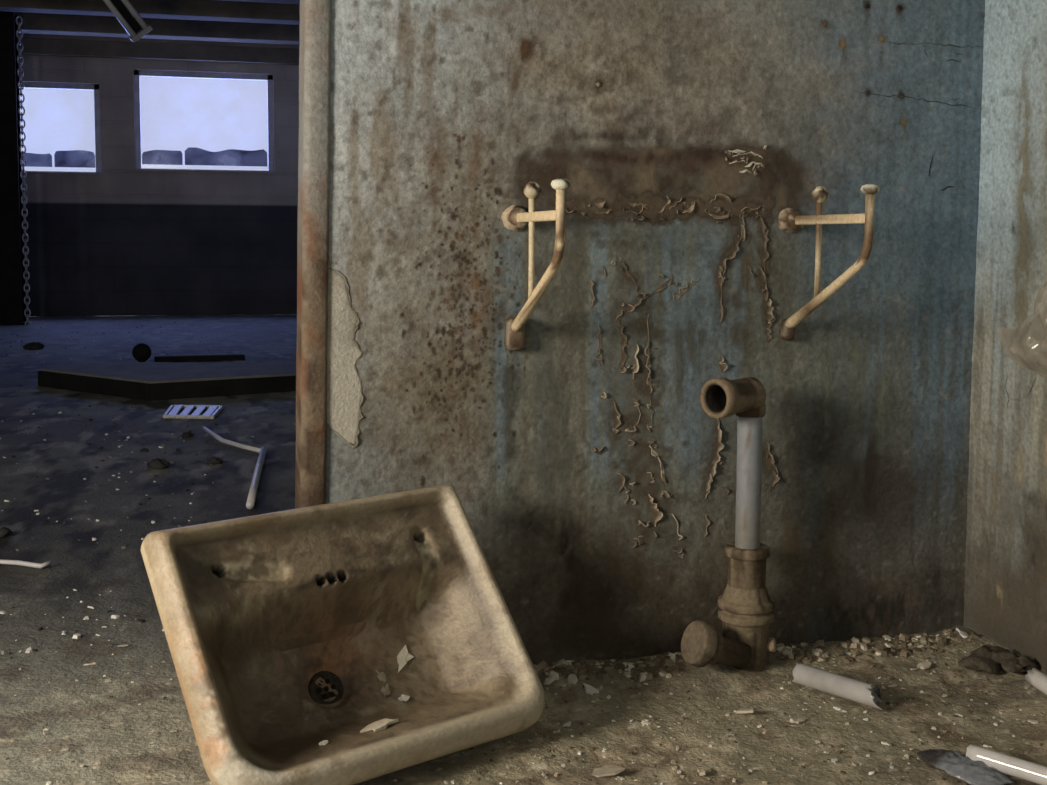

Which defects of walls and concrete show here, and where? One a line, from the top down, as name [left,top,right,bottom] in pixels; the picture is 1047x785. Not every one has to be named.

peeling [327,256,364,449]
corrosion [413,159,519,440]
peeling [591,257,700,558]
peeling [549,191,776,344]
peeling [704,418,730,499]
peeling [725,145,767,176]
water stain [1013,105,1029,269]